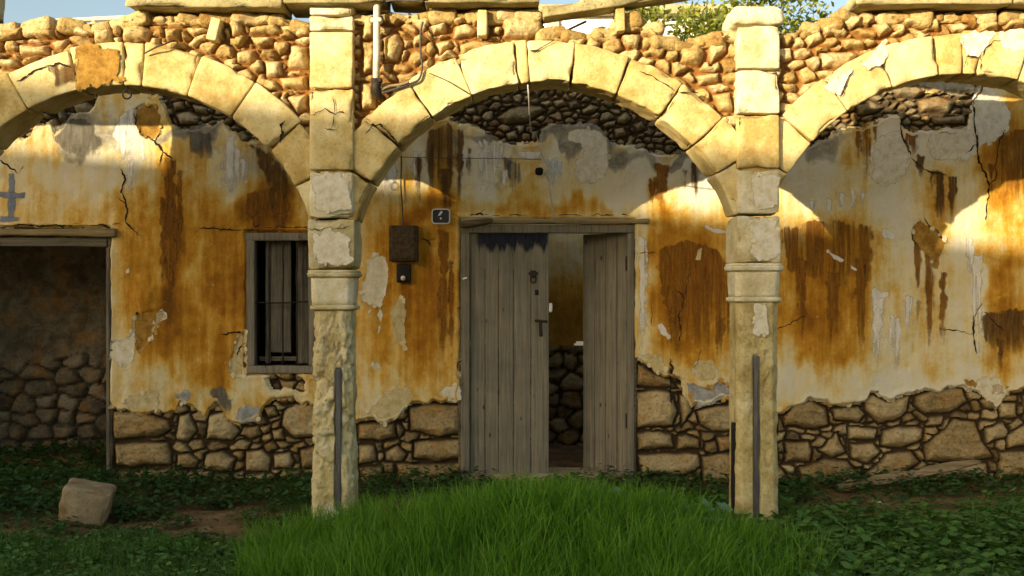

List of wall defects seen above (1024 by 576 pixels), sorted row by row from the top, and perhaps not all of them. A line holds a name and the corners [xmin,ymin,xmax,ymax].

crack [960,35,1004,220]
peeling [568,126,611,183]
crack [1,169,141,236]
peeling [311,171,352,214]
peeling [312,227,354,266]
peeling [359,252,407,351]
water stain [636,236,648,329]
peeling [361,385,413,427]
peeling [439,383,461,403]
peeling [637,354,668,375]
peeling [686,359,729,408]
peeling [964,374,1009,404]